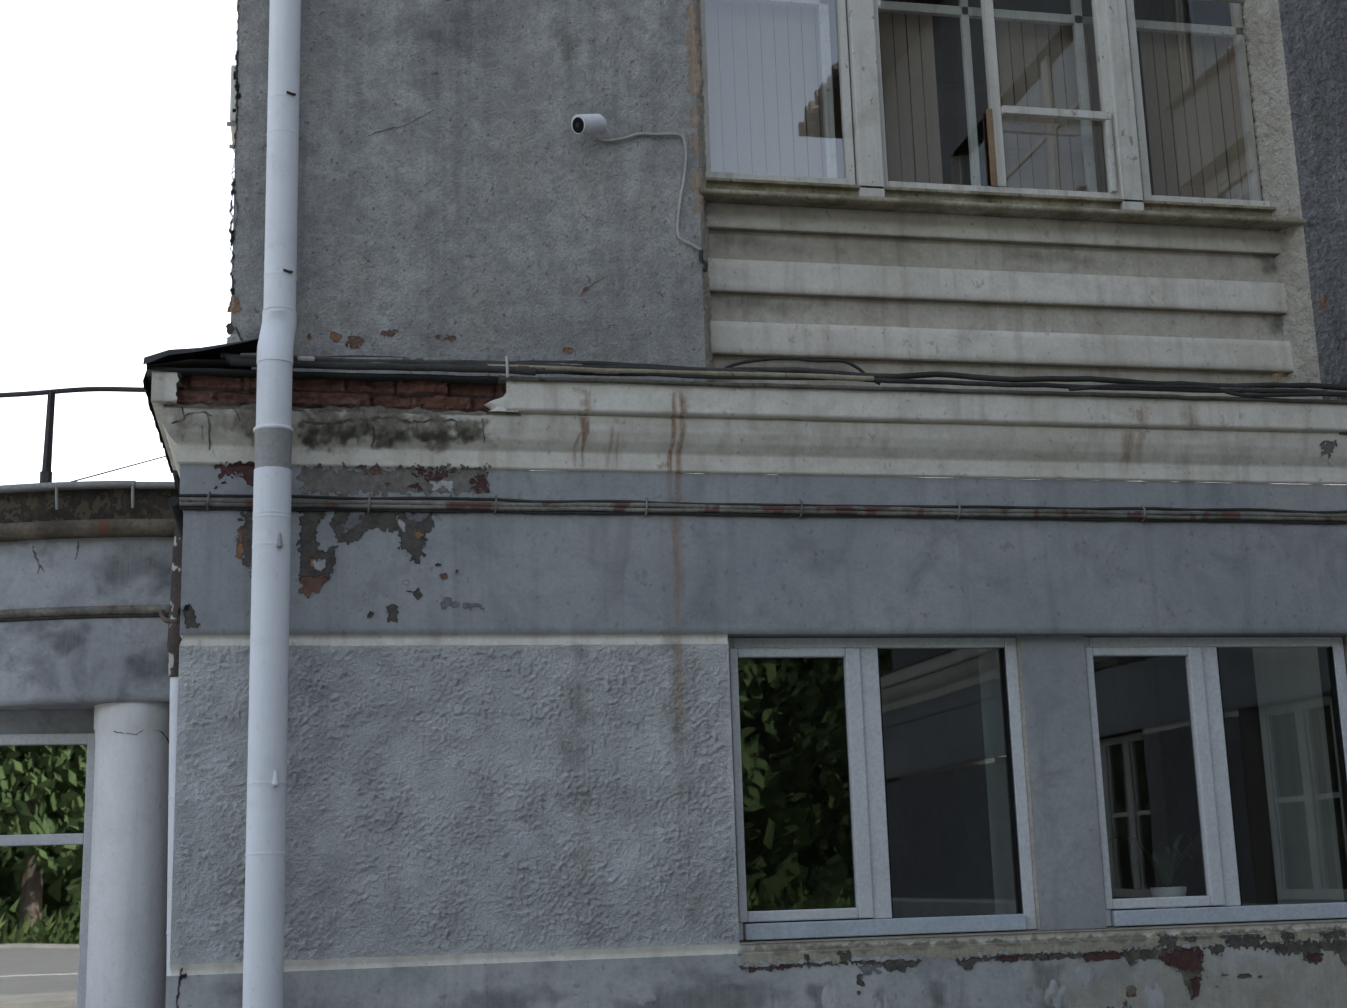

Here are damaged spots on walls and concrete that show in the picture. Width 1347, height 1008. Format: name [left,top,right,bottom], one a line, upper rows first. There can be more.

crack [228,0,241,288]
spalling [164,373,257,409]
spalling [292,379,521,416]
corrosion [668,396,684,475]
peeling [214,461,255,489]
peeling [235,511,253,578]
peeling [295,462,492,598]
spalling [177,604,200,629]
peeling [367,604,399,623]
crack [176,968,187,1008]
peeling [739,950,921,995]
peeling [956,928,1347,1000]